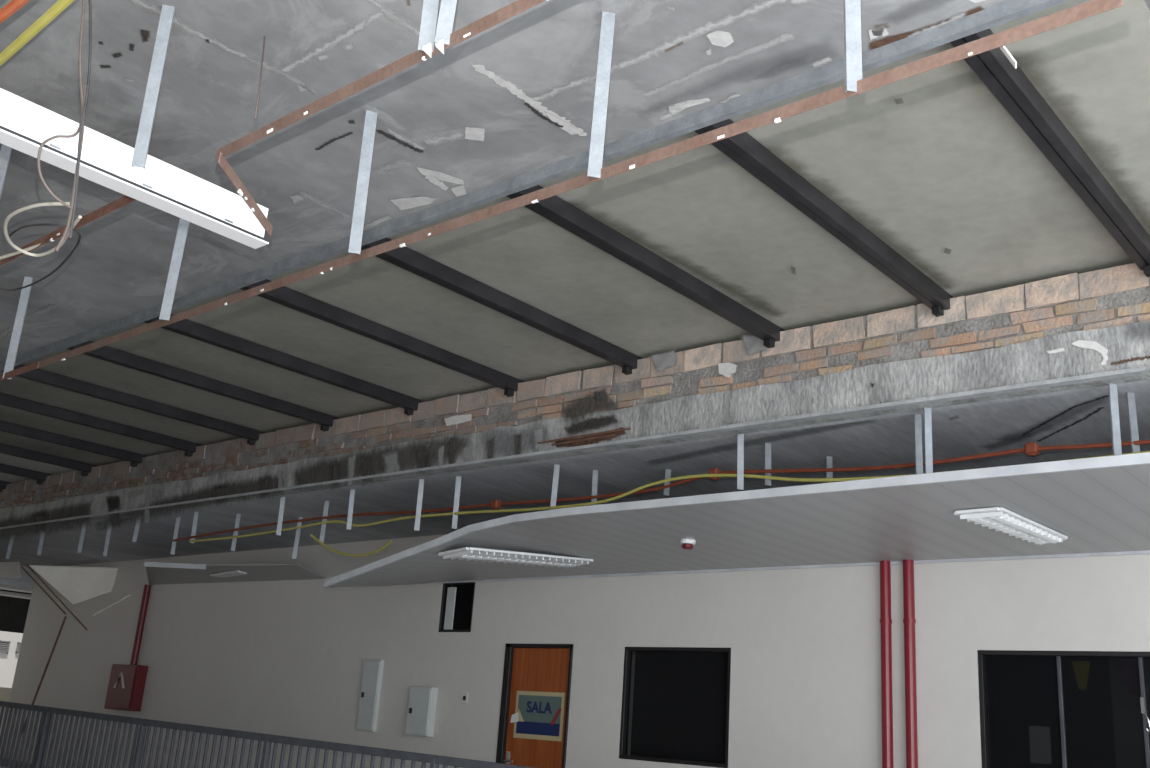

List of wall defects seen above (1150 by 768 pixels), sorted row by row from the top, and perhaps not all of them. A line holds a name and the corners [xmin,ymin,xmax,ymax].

peeling [706,31,734,55]
crack [472,65,619,136]
flaking render [365,160,467,227]
water stain [562,389,617,420]